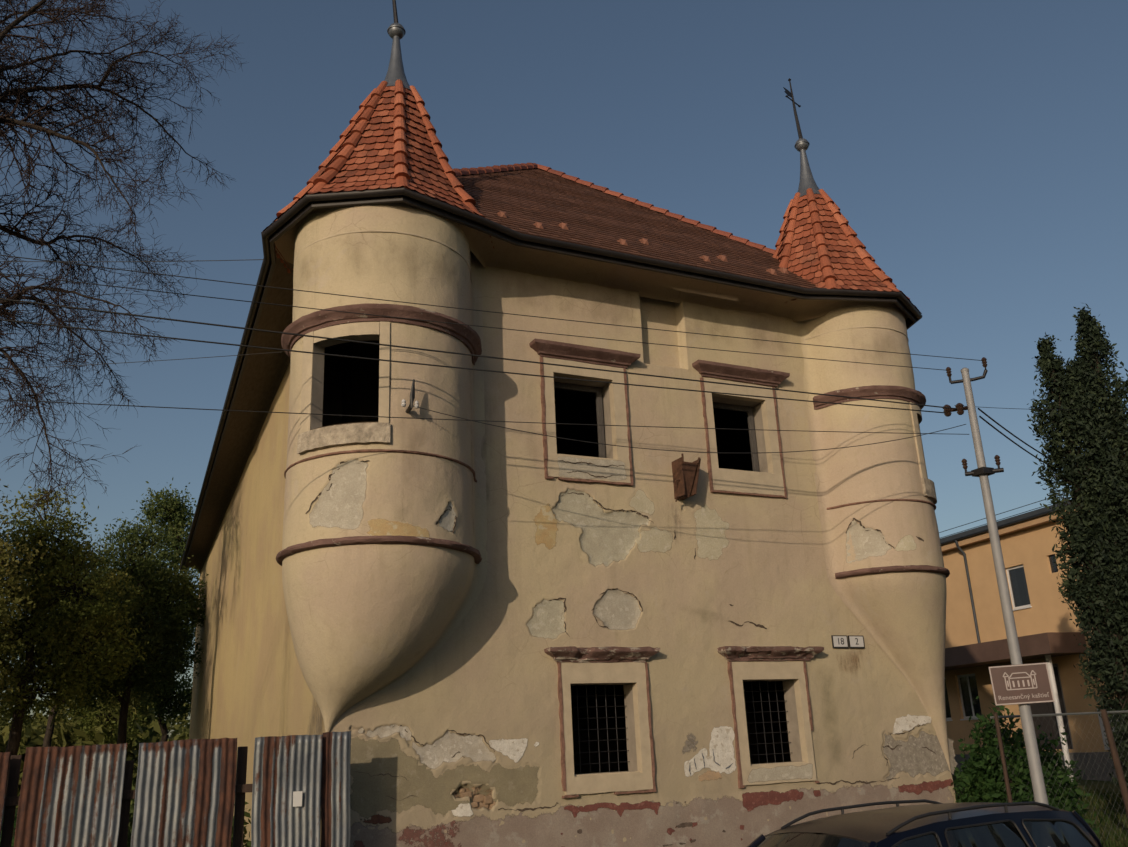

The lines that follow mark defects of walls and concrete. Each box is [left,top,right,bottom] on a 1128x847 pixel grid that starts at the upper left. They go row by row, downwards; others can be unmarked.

flaking render [306,460,369,530]
flaking render [436,502,457,533]
flaking render [552,489,654,566]
flaking render [846,518,895,563]
flaking render [592,588,643,630]
crack [729,604,767,629]
flaking render [357,724,539,769]
flaking render [891,714,932,735]
spalling [398,784,495,847]
peeling [564,800,661,834]